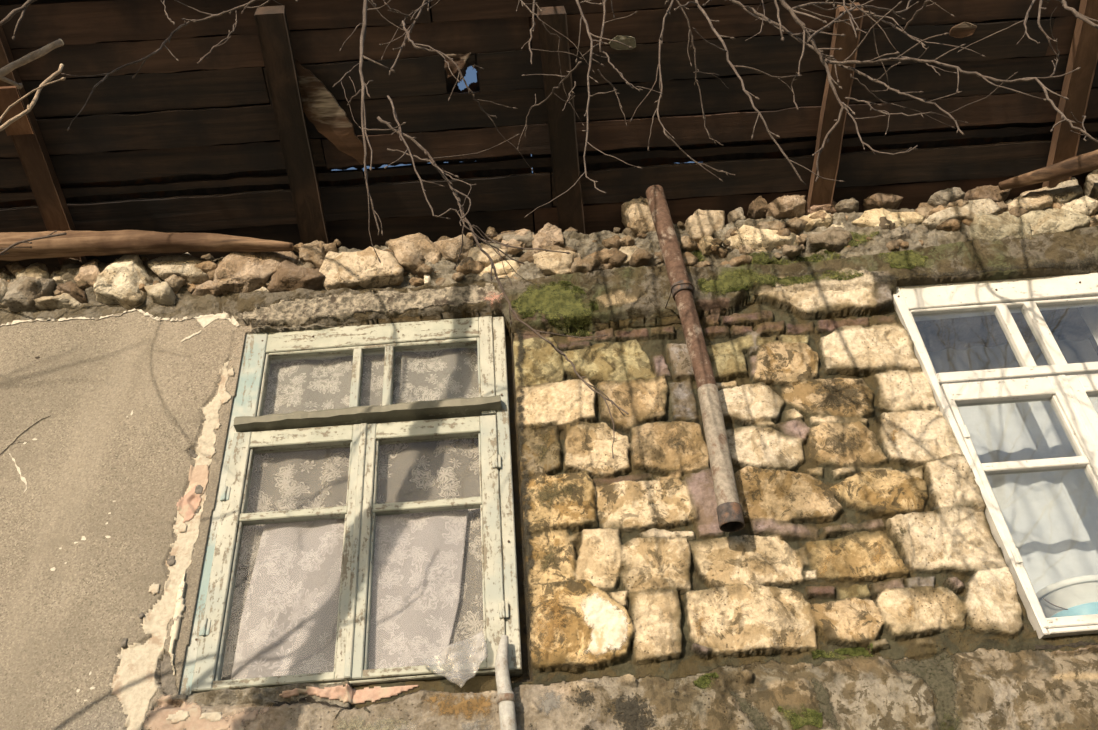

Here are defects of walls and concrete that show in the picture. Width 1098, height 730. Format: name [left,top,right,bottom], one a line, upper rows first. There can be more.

crack [0,415,51,455]
peeling [109,350,418,730]